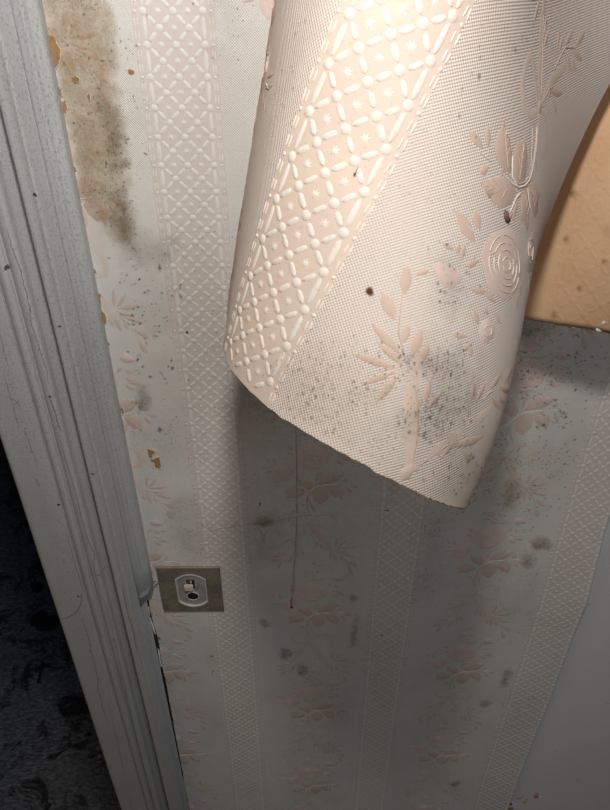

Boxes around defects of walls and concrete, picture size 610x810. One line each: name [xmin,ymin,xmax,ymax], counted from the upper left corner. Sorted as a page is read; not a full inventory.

peeling [147,449,161,470]
peeling [223,0,610,509]